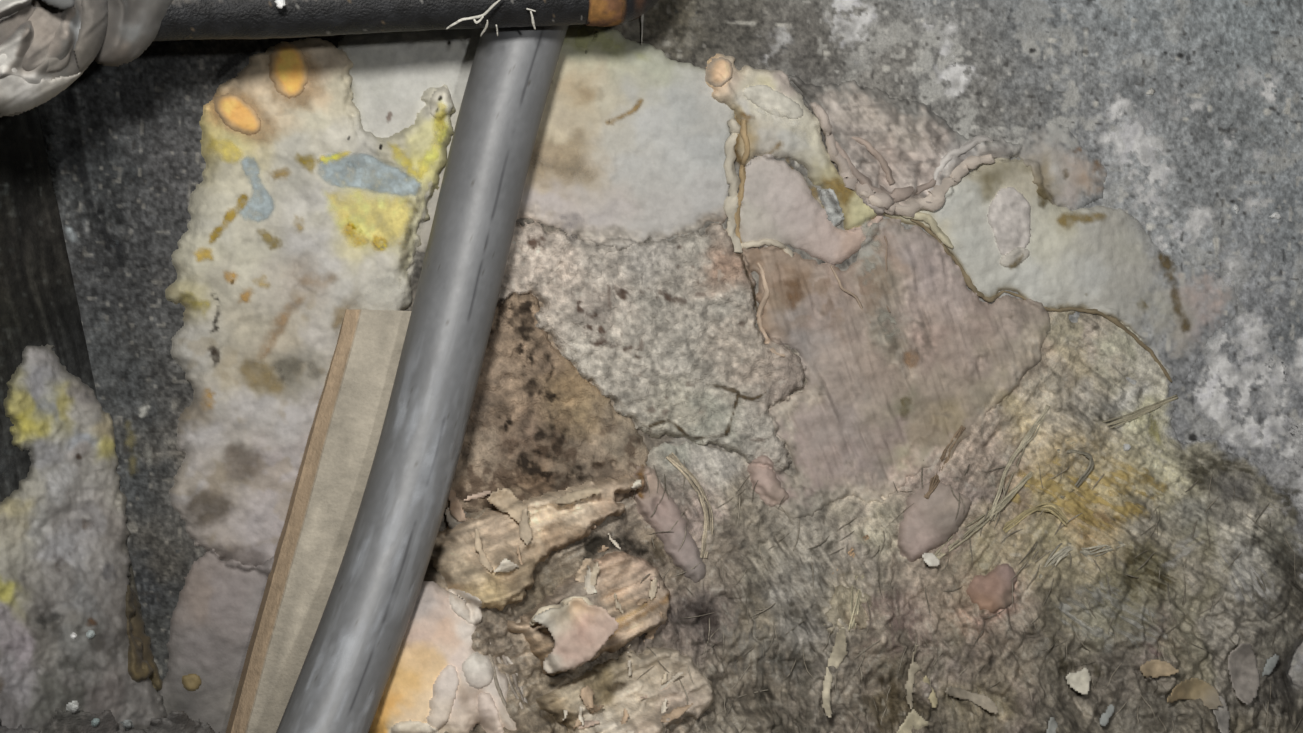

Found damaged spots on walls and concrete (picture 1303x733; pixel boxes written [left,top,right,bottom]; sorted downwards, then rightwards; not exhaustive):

rust [583,0,623,27]
peeling [788,75,1019,227]
water stain [197,195,247,260]
water stain [330,194,409,250]
water stain [490,299,550,362]
flaking render [496,221,805,470]
water stain [1193,313,1303,520]
water stain [517,425,564,480]
peeling [487,488,532,545]
peeling [529,596,619,673]
peeling [896,645,998,733]
peeling [1066,668,1091,694]